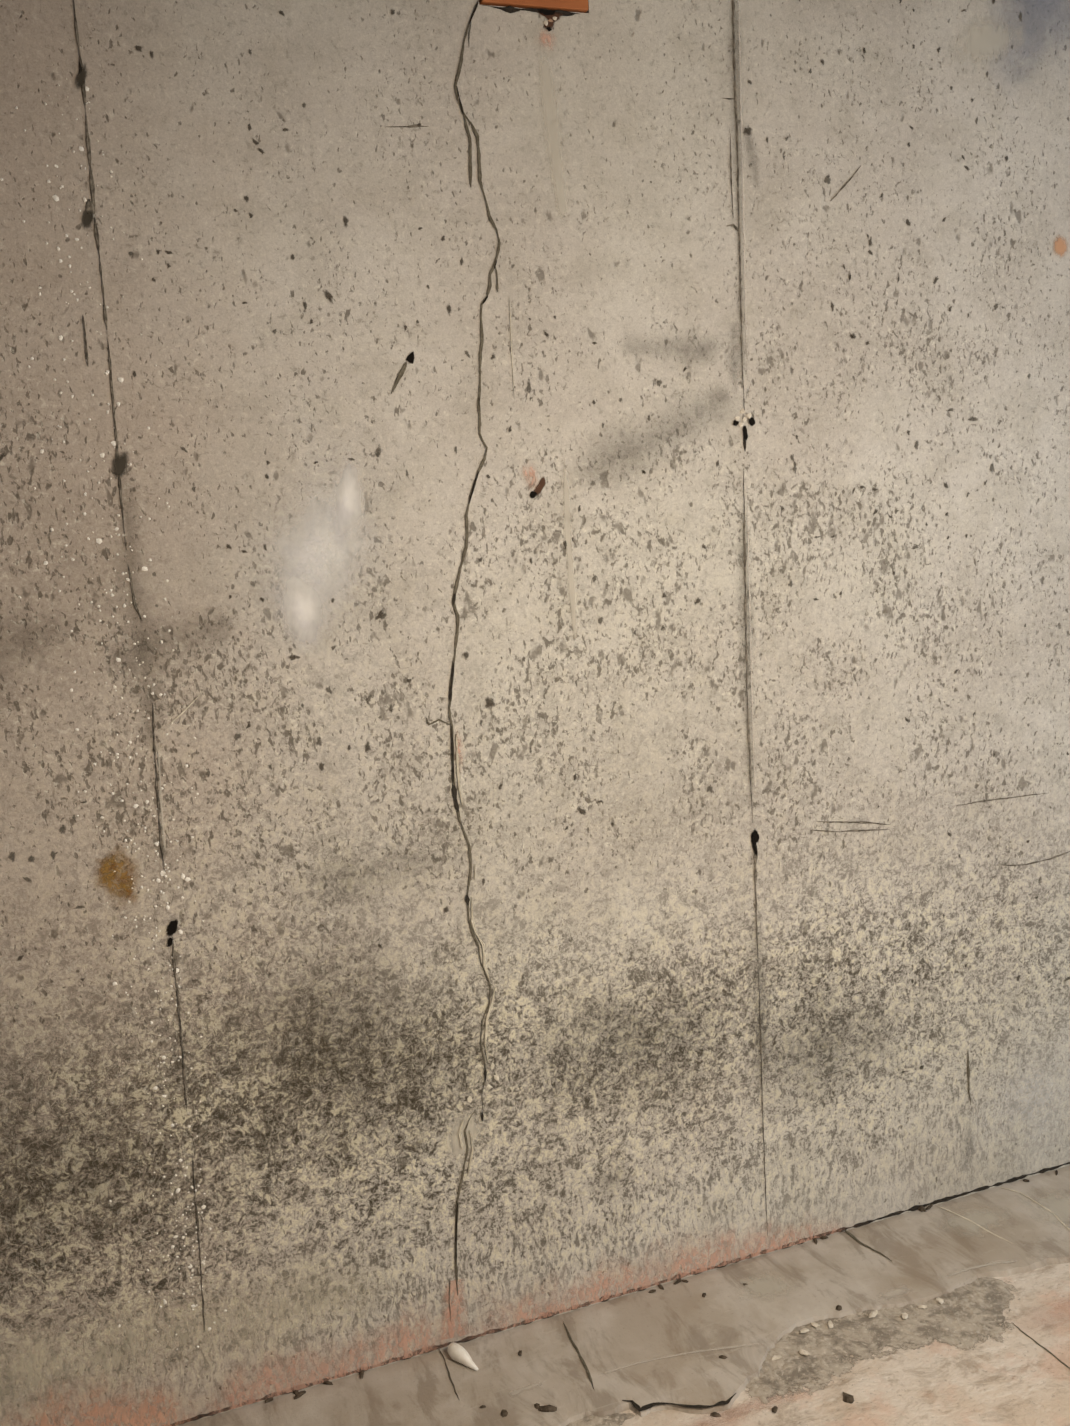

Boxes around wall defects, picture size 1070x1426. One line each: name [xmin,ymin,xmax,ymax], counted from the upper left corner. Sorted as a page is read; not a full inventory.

crack [426,0,501,1399]
corrosion [99,856,134,896]
spalling [746,1276,1020,1404]
spalling [566,1413,634,1426]